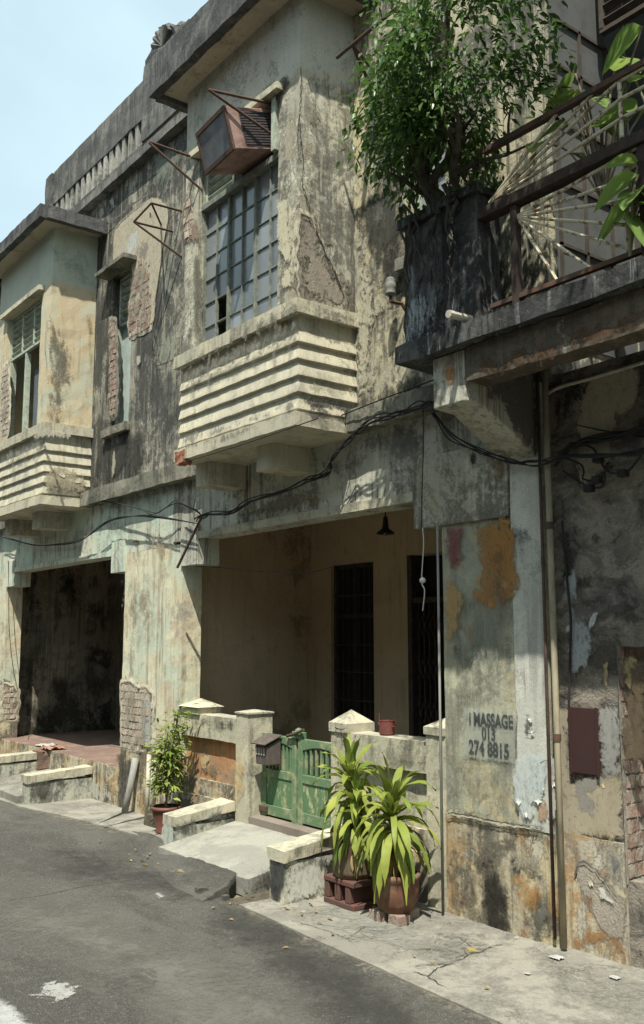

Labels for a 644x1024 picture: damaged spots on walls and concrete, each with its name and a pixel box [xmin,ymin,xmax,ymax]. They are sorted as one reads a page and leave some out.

crack [297,77,346,302]
flaking render [276,88,385,394]
peeling [106,192,168,421]
flaking render [0,360,11,442]
water stain [47,316,75,422]
water stain [20,533,164,733]
peeling [563,568,598,674]
flaking render [0,679,21,723]
flaking render [119,675,156,754]
flaking render [574,646,644,884]
water stain [449,847,512,932]
crack [417,939,503,987]